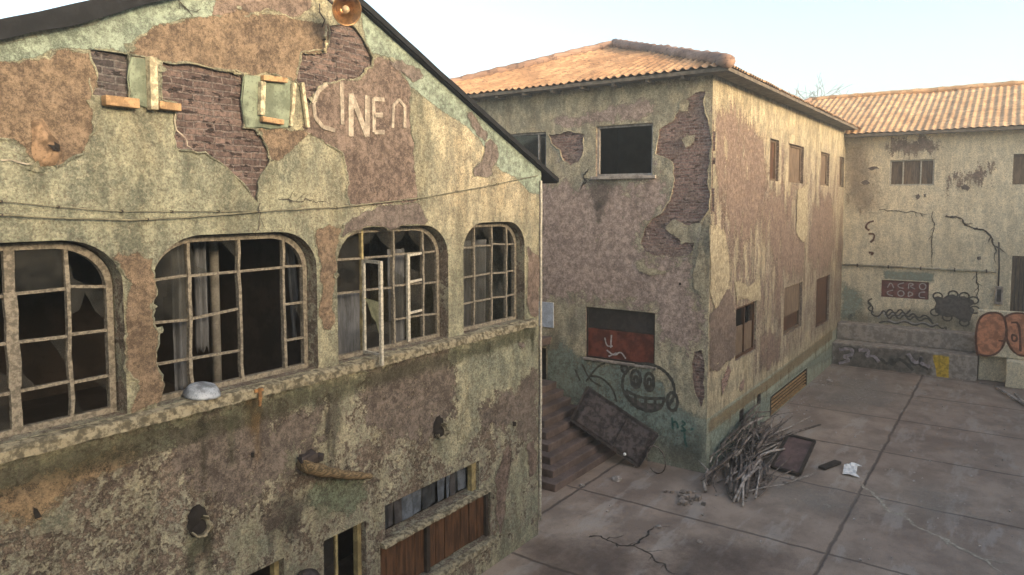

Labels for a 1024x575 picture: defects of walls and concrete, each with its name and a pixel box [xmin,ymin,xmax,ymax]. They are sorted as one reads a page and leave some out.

peeling [0,0,832,537]
crack [881,209,1005,298]
crack [589,526,676,574]